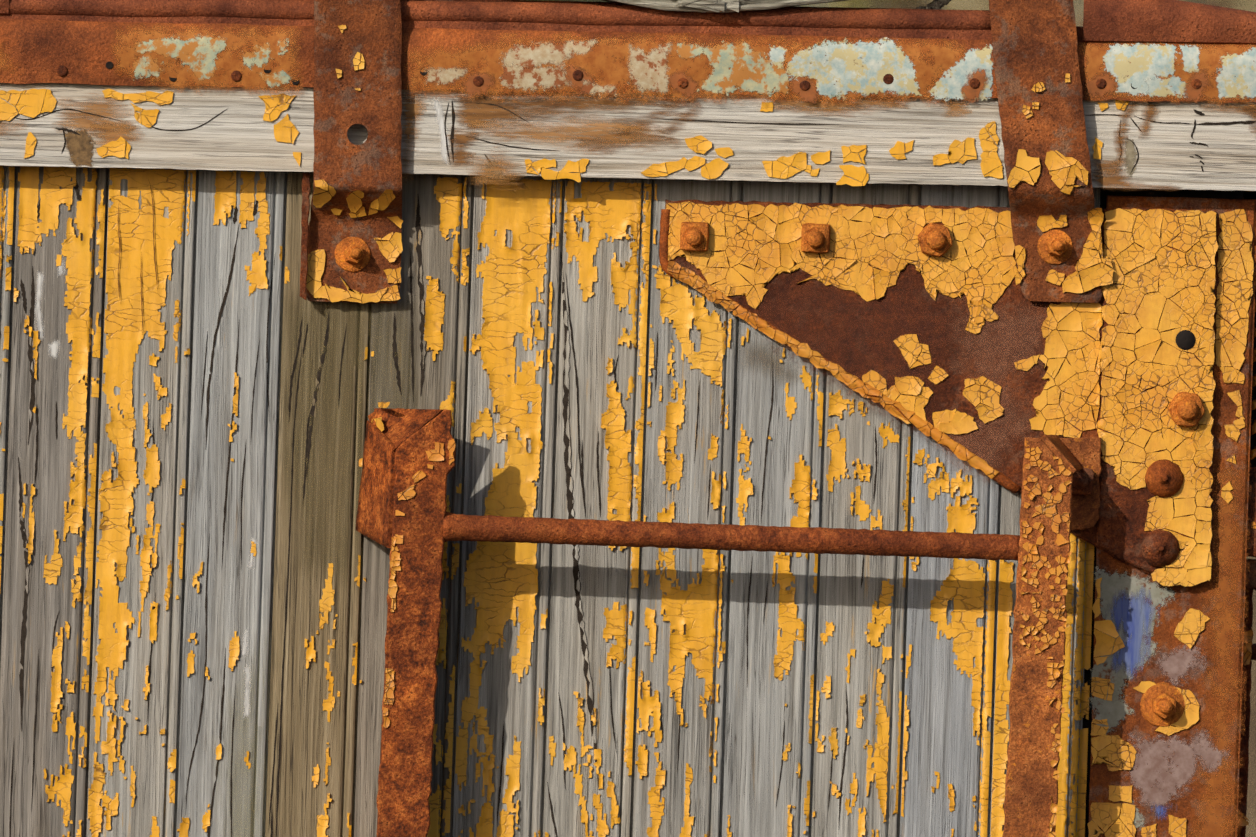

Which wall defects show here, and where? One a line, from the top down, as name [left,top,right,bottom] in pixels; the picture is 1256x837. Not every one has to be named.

rust [114,27,299,93]
peeling [500,37,993,112]
peeling [1098,42,1200,112]
peeling [0,89,203,837]
peeling [306,179,403,304]
peeling [427,541,548,837]
peeling [603,546,733,837]
peeling [434,135,1026,534]
peeling [808,556,919,837]
rust [759,281,1043,466]
peeling [930,208,1254,837]
rust [1130,469,1241,837]